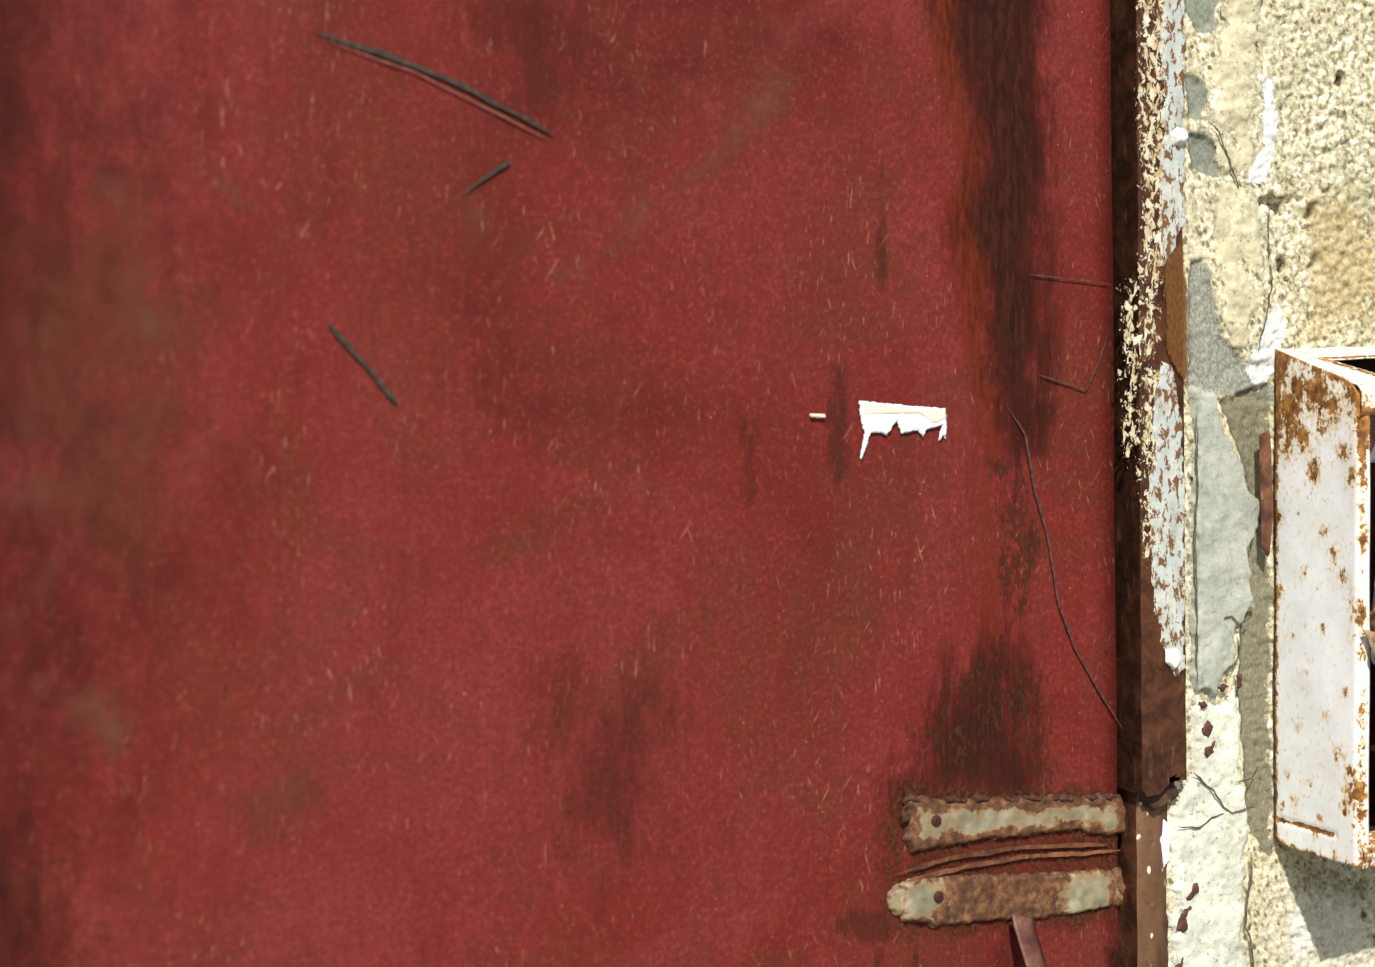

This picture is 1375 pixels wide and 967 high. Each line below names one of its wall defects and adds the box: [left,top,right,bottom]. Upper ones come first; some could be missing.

rust [929,0,1051,622]
spalling [1117,0,1287,856]
rust [874,775,1115,939]
peeling [1161,819,1170,866]